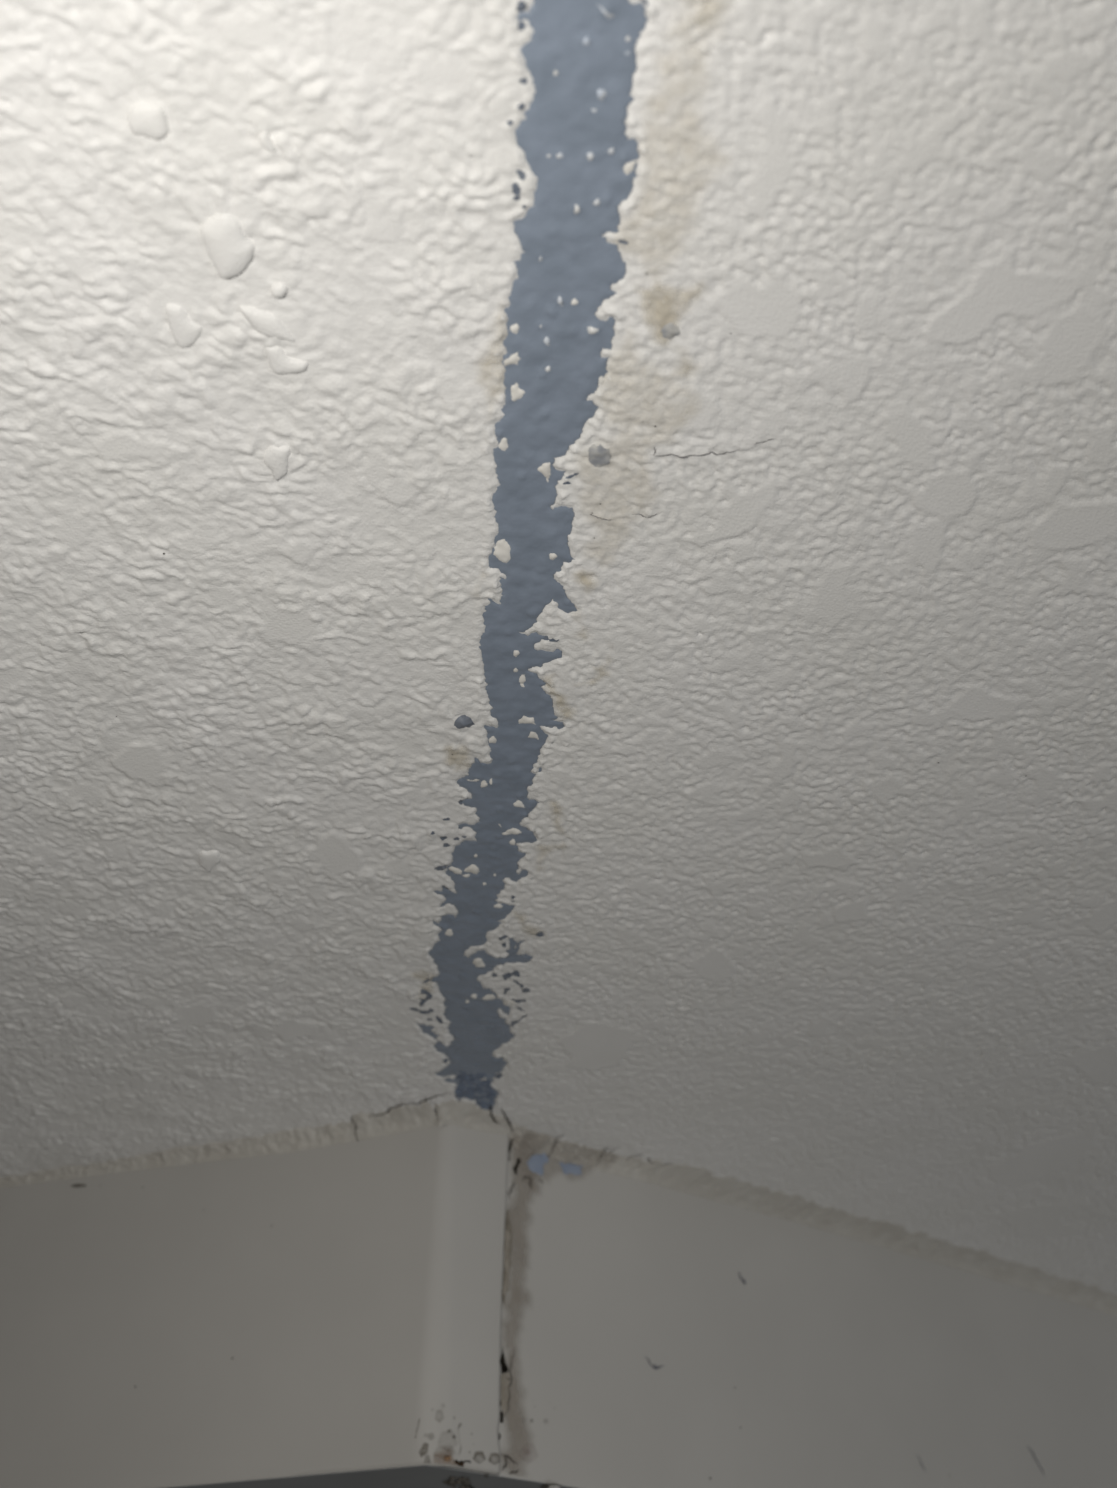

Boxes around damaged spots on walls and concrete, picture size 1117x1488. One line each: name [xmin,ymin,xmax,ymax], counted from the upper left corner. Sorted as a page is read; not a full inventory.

crack [653,439,773,458]
peeling [409,0,649,1111]
crack [502,1454,519,1474]